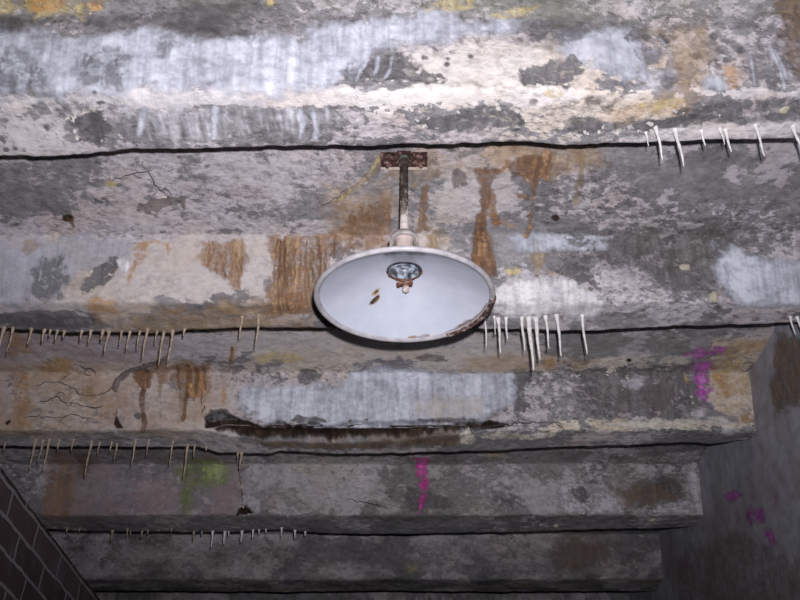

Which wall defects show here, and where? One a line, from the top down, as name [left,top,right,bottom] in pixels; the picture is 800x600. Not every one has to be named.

damp [0,0,523,100]
peeling [354,51,451,84]
peeling [517,54,595,89]
peeling [65,91,111,146]
crack [112,170,171,198]
rust [472,150,555,276]
rust [266,234,338,315]
damp [493,223,800,318]
crack [25,366,112,420]
rust [134,360,210,429]
damp [236,366,516,428]
spalling [205,409,558,450]